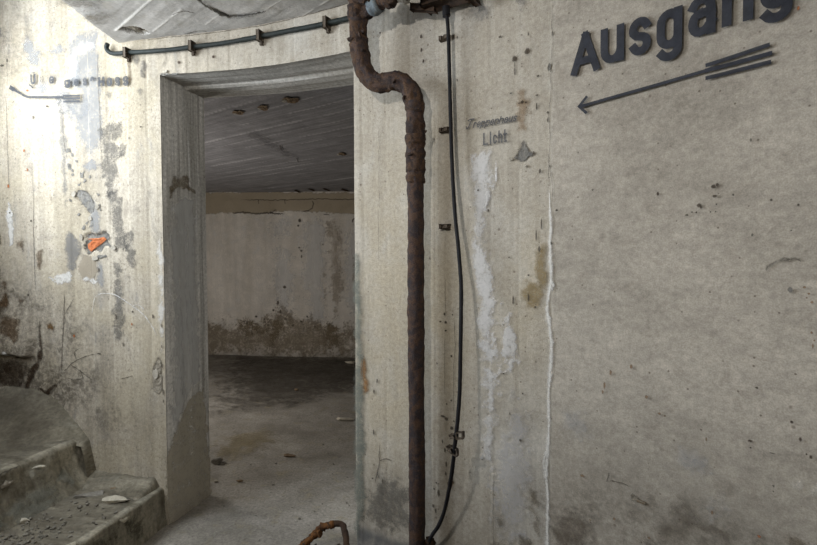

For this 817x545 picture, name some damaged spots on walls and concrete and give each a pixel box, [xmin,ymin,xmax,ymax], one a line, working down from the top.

peeling [38,33,102,149]
spalling [66,148,116,286]
damp [164,175,212,526]
damp [208,219,409,531]
damp [471,153,519,460]
crack [542,52,555,545]
corrosion [298,520,335,545]